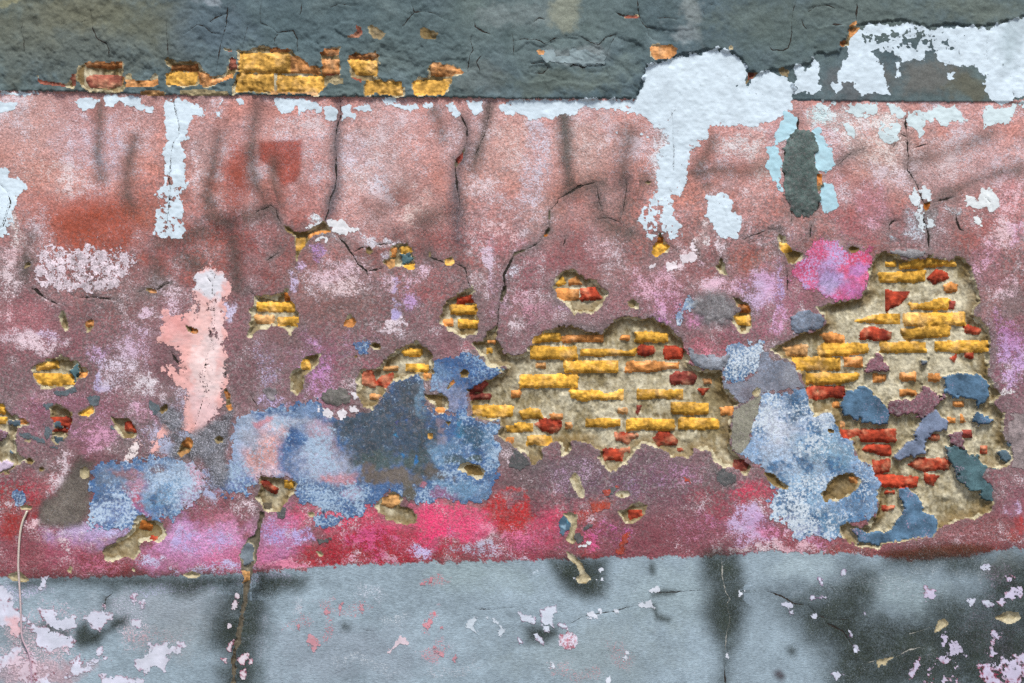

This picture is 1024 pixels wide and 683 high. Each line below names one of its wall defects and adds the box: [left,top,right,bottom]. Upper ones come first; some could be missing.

flaking render [0,25,483,239]
crack [325,101,390,275]
crack [454,104,490,205]
crack [496,180,631,328]
peeling [497,17,1024,272]
crack [894,118,964,250]
flaking render [0,354,100,475]
peeling [80,234,1014,583]
peeling [12,489,32,510]
peeling [0,572,187,683]
crack [231,511,265,683]
peeling [908,575,1024,683]